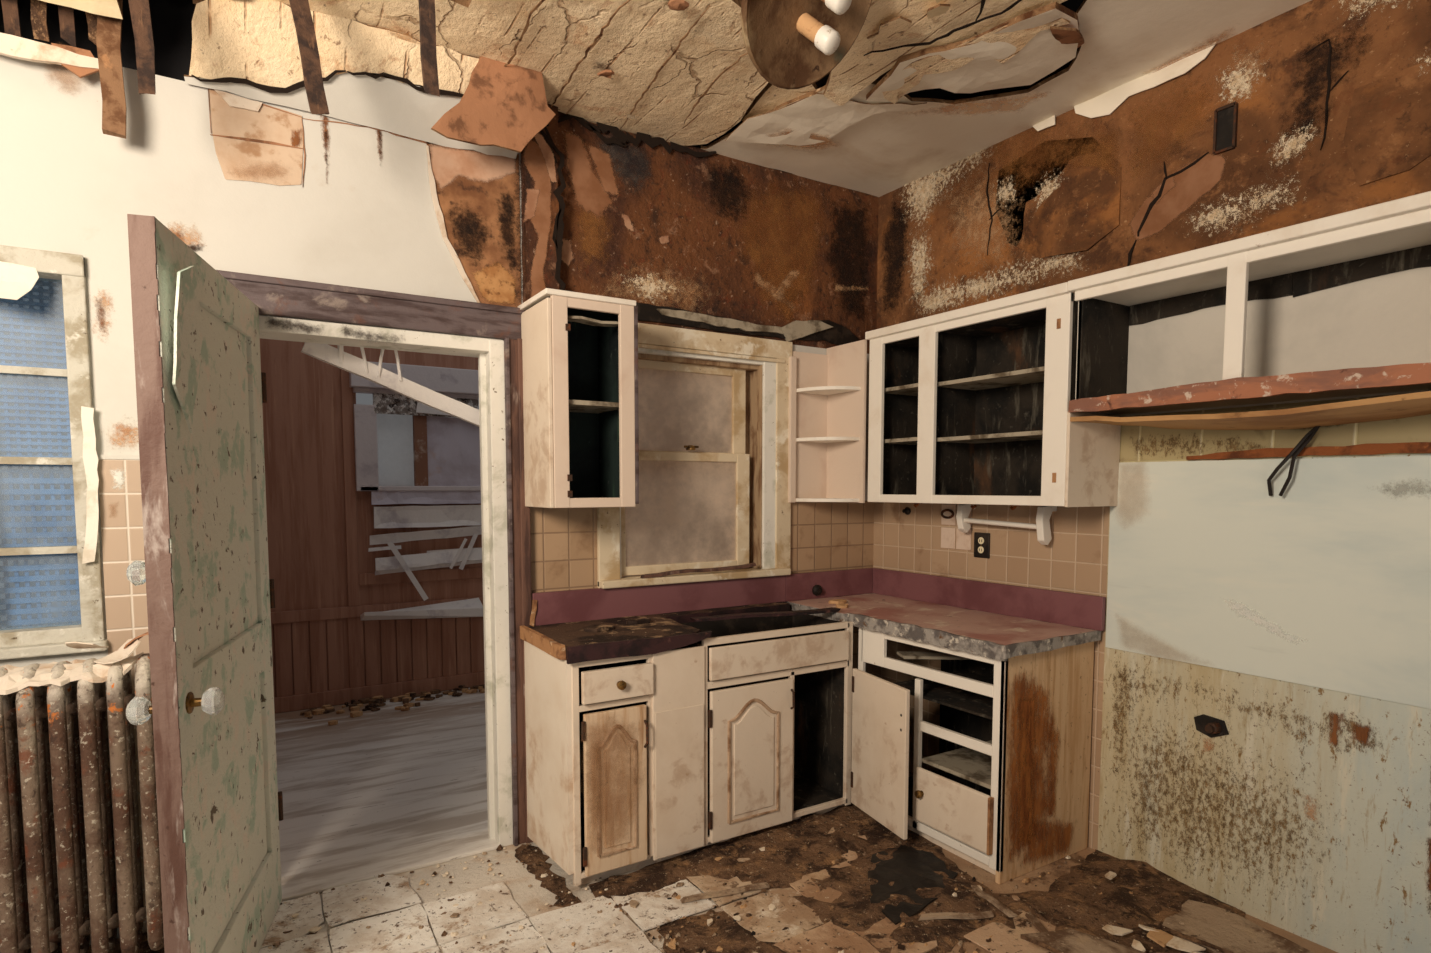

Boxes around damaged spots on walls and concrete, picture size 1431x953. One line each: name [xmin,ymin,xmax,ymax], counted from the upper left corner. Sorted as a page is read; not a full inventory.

flaking render [208,88,303,186]
crack [540,0,748,290]
peeling [725,93,927,146]
crack [864,0,1022,56]
peeling [1074,42,1217,118]
water stain [1185,0,1410,238]
flaking render [426,132,634,307]
water stain [705,132,1113,319]
crack [1127,152,1209,266]
water stain [609,268,700,309]
water stain [1098,661,1340,910]
corrosion [1316,712,1383,752]